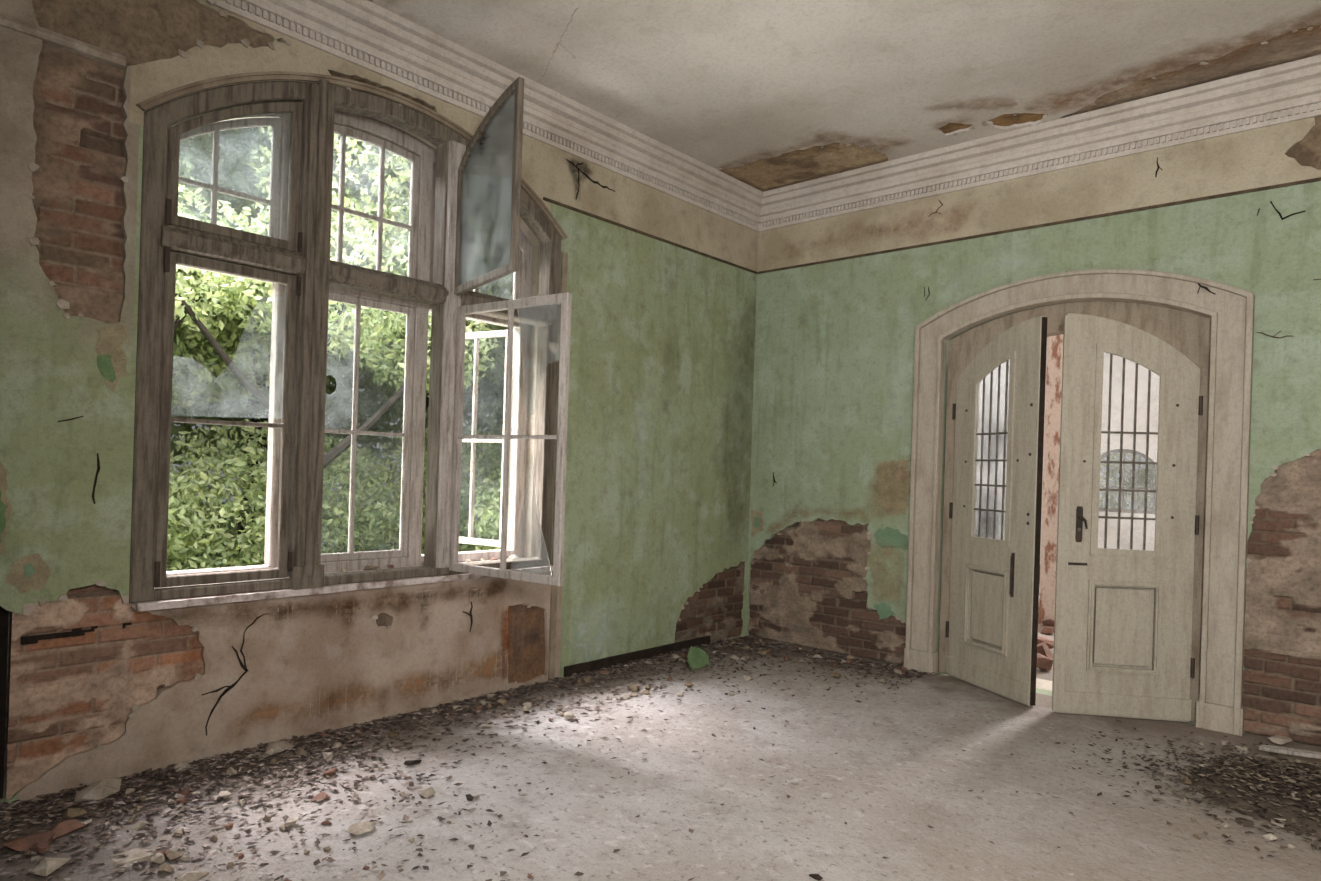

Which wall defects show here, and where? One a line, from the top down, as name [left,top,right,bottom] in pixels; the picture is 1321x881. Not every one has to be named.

flaking render [28,0,292,392]
flaking render [329,71,434,116]
spalling [719,142,888,192]
spalling [939,113,1045,135]
spalling [1061,25,1321,118]
flaking render [1285,116,1321,170]
flaking render [0,462,203,799]
crack [201,613,270,736]
flaking render [507,603,549,685]
flaking render [674,459,911,665]
flaking render [1243,449,1321,746]